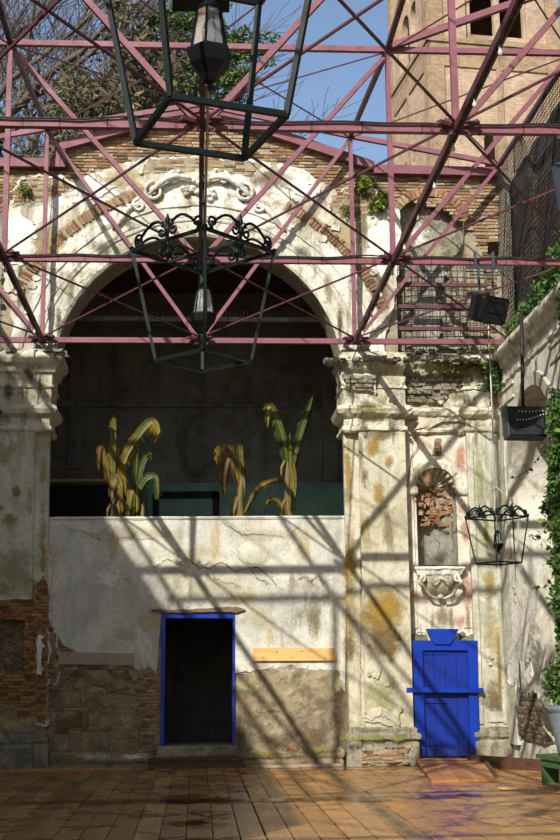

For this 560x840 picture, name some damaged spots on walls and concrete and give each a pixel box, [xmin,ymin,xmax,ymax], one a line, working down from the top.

spalling [323,266,481,405]
spalling [432,438,442,456]
peeling [415,417,466,430]
crack [60,524,155,541]
crack [153,523,299,589]
water stain [300,520,370,658]
water stain [384,514,392,544]
spalling [416,485,454,528]
spalling [0,572,60,727]
water stain [364,590,403,661]
peeling [503,513,547,744]
spalling [134,675,161,754]